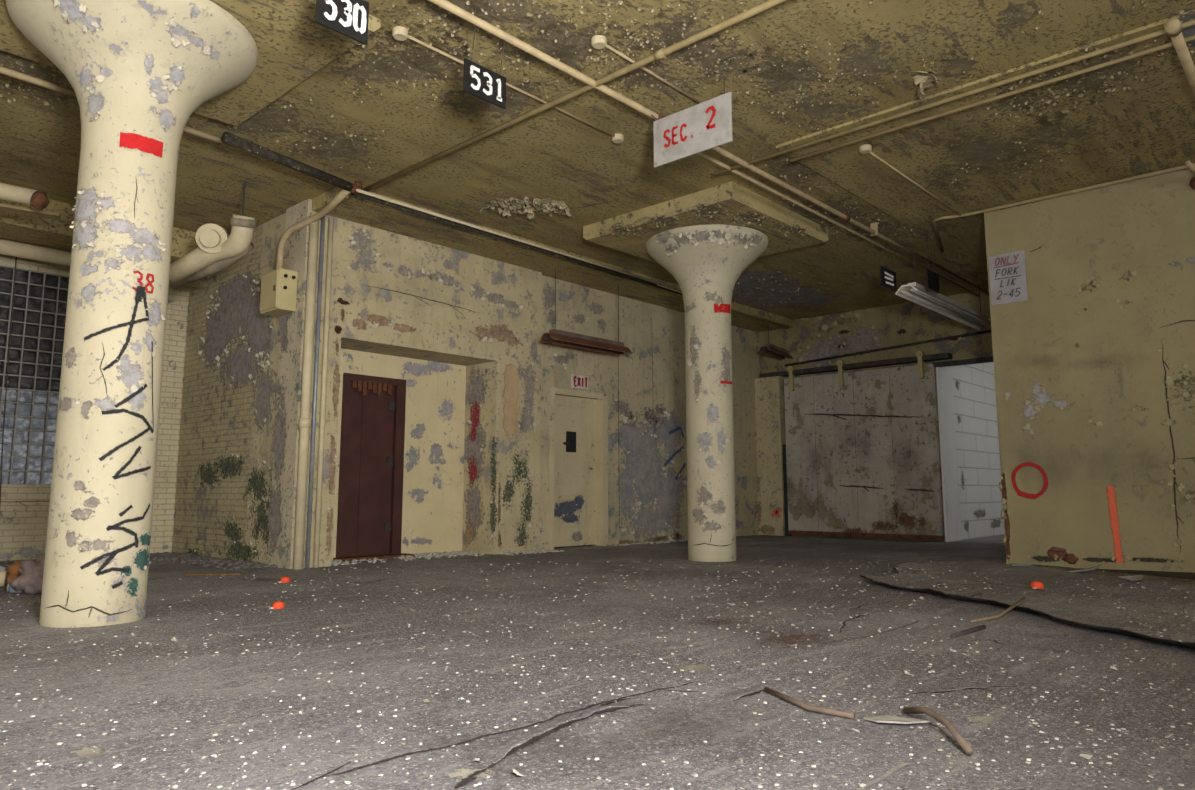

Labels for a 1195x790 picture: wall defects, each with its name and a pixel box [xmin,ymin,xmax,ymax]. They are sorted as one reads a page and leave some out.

peeling [0,50,113,121]
peeling [598,156,923,257]
peeling [344,224,523,310]
peeling [57,297,166,420]
peeling [187,264,289,563]
peeling [352,314,416,334]
peeling [404,423,446,472]
flaking render [463,323,575,551]
peeling [684,265,908,468]
crack [1159,320,1195,563]
peeling [692,486,727,533]
crack [292,678,763,790]